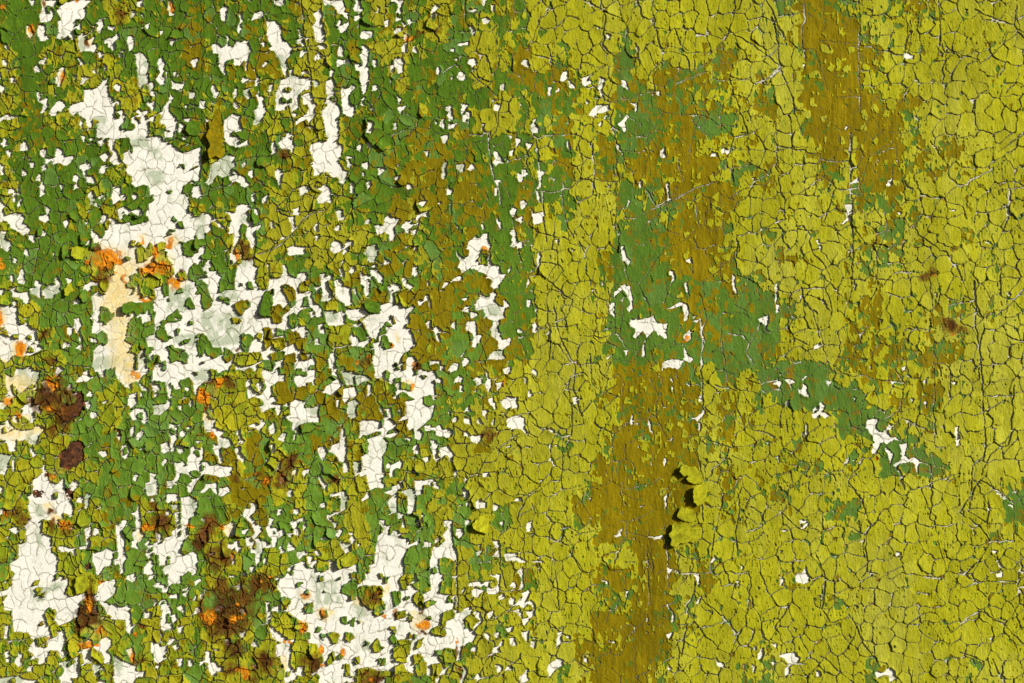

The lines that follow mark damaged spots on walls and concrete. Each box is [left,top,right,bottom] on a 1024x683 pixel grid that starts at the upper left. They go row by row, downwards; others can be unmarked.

crack [756,0,806,130]
crack [534,136,574,242]
crack [819,133,887,285]
rust [4,376,76,439]
rust [85,238,183,383]
peeling [0,0,551,683]
peeling [600,103,957,683]
crack [929,281,1024,500]
rust [75,575,104,649]
rust [187,515,286,681]
rust [302,646,324,671]
peeling [547,631,570,676]